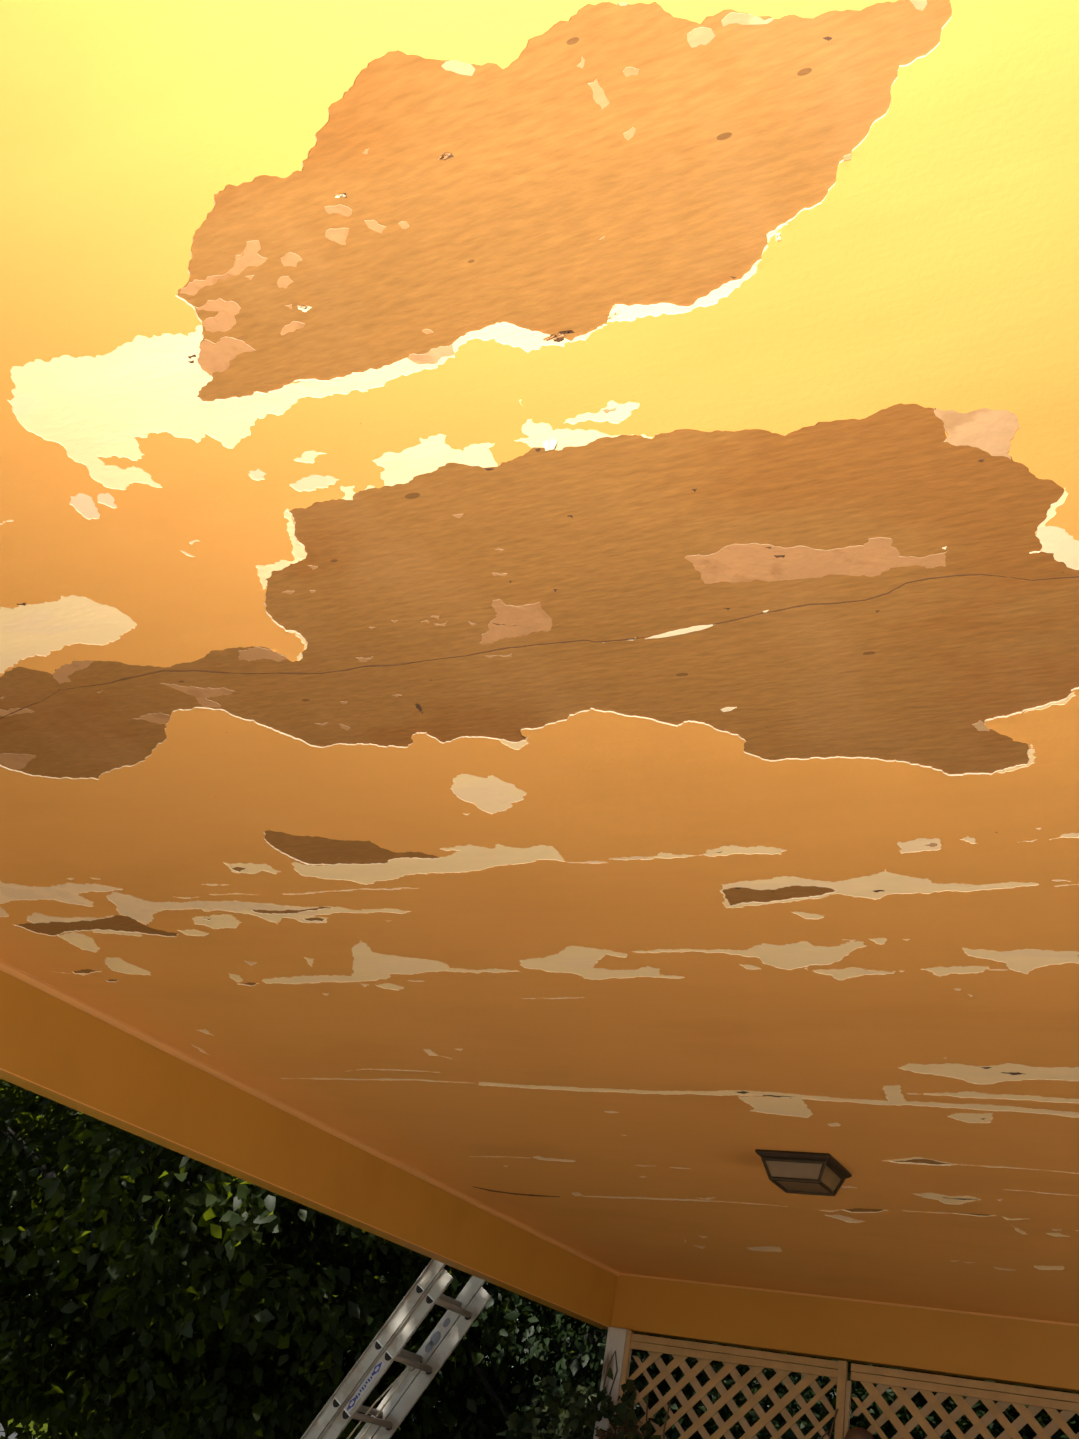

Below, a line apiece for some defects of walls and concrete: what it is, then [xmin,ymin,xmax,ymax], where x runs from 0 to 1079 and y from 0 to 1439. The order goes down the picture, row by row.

peeling [7,0,952,520]
peeling [0,399,1079,780]
crack [713,574,1079,625]
crack [0,637,644,719]
peeling [450,774,527,815]
peeling [0,830,786,982]
peeling [720,869,1079,919]
peeling [228,938,1079,997]
peeling [281,1048,1079,1123]